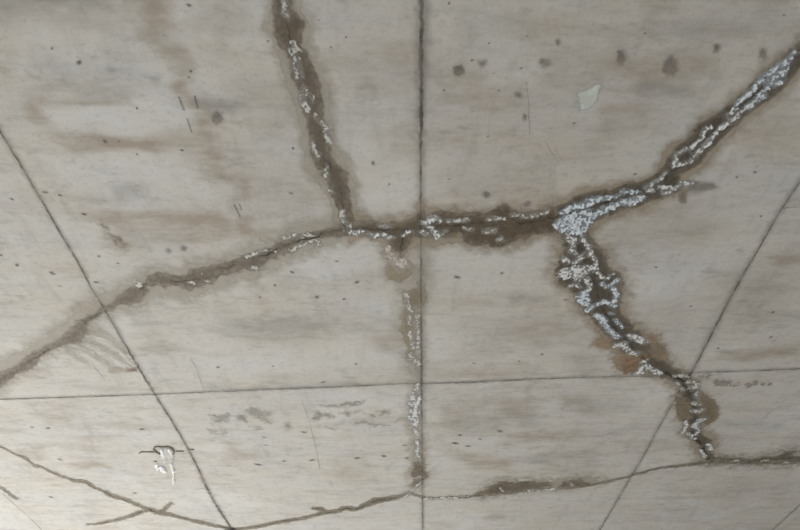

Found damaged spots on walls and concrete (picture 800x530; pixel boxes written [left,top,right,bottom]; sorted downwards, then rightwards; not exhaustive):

leakage [0,0,364,389]
crack [262,233,322,256]
leakage [344,42,800,468]
crack [0,411,800,530]
leakage [403,383,428,497]
crack [665,372,690,393]